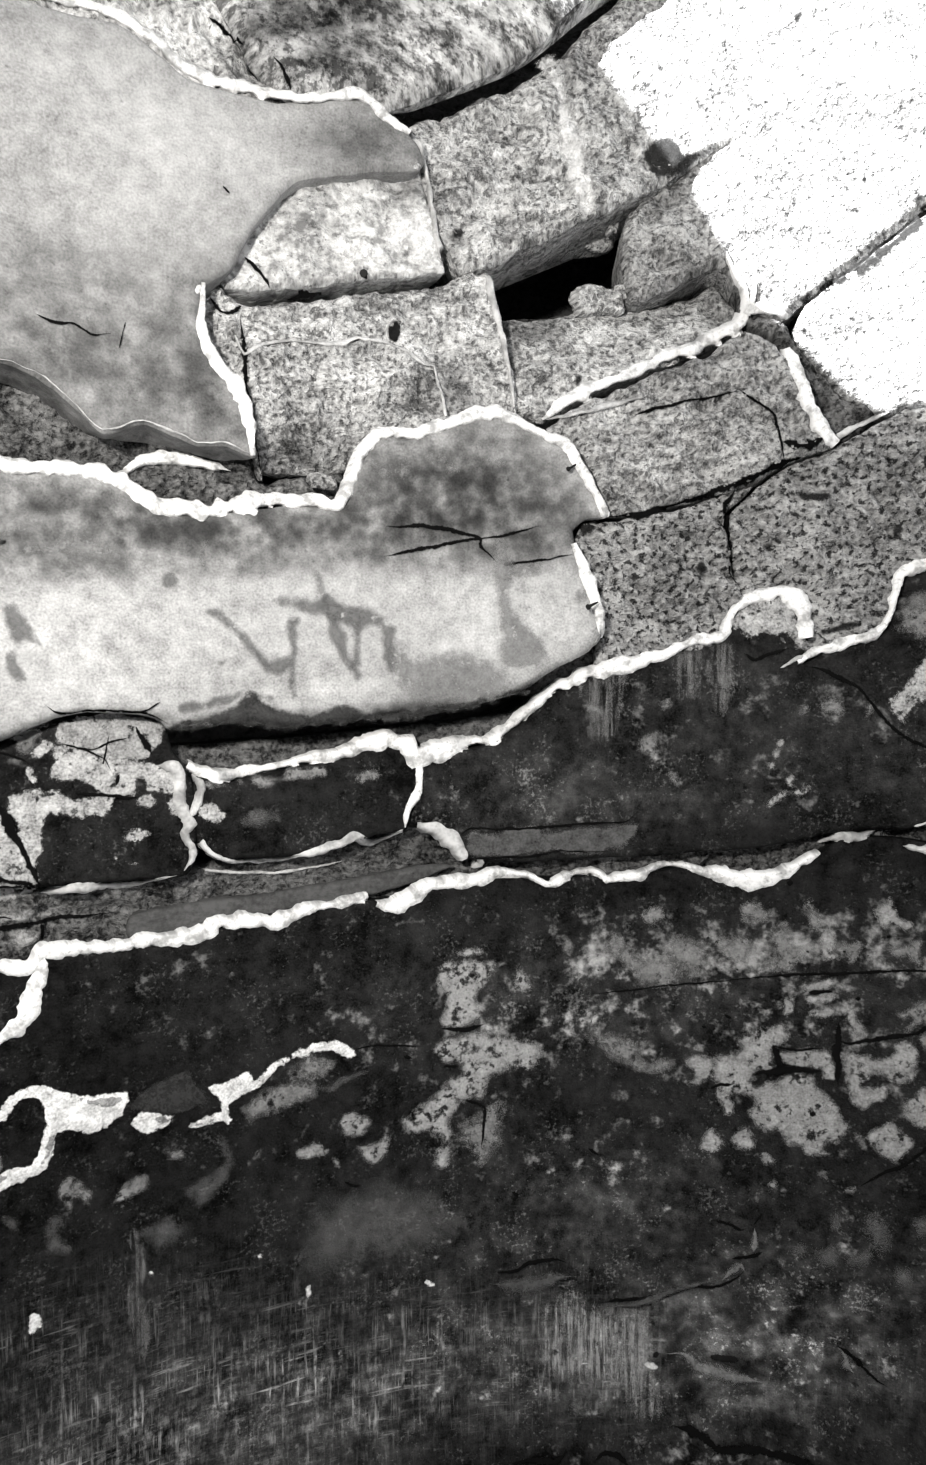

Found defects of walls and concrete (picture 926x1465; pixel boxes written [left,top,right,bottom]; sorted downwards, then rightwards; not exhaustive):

spalling [645,137,712,177]
spalling [797,278,834,303]
crack [610,389,823,587]
crack [386,523,572,566]
peeling [889,658,926,723]
peeling [252,767,326,787]
peeling [198,783,225,824]
peeling [0,740,178,945]
peeling [71,1070,214,1126]
peeling [245,1056,356,1118]
peeling [297,1144,339,1165]
peeling [116,1175,147,1201]